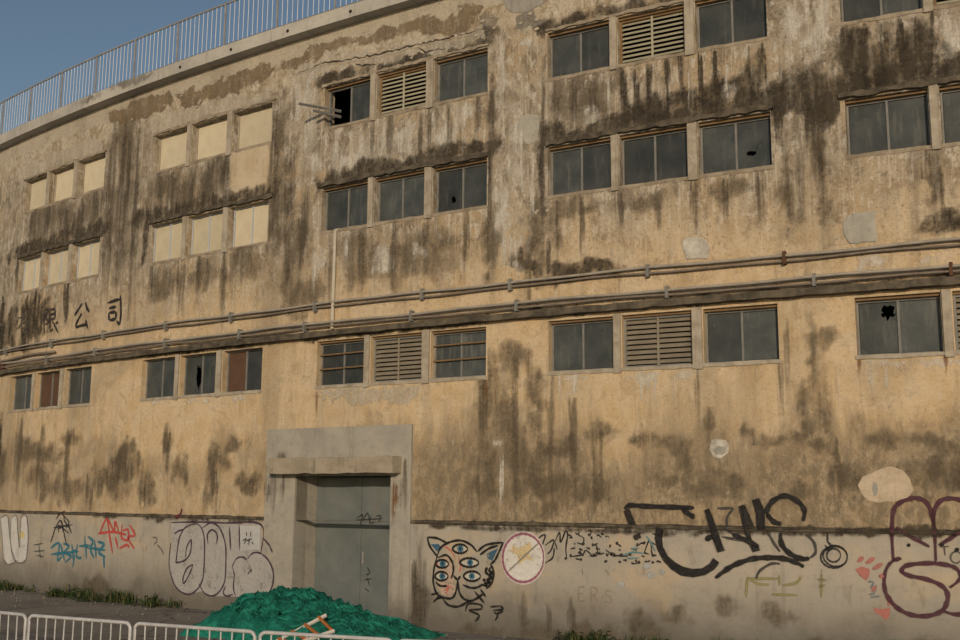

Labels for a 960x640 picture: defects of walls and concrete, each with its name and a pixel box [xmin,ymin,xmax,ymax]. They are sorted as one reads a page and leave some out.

peeling [109,4,497,134]
leakage [296,0,960,313]
leakage [7,118,292,300]
leakage [283,217,326,320]
leakage [0,290,52,351]
leakage [808,329,833,372]
leakage [0,421,140,504]
leakage [163,430,187,484]
leakage [208,437,238,491]
leakage [476,342,610,509]
leakage [146,515,209,524]